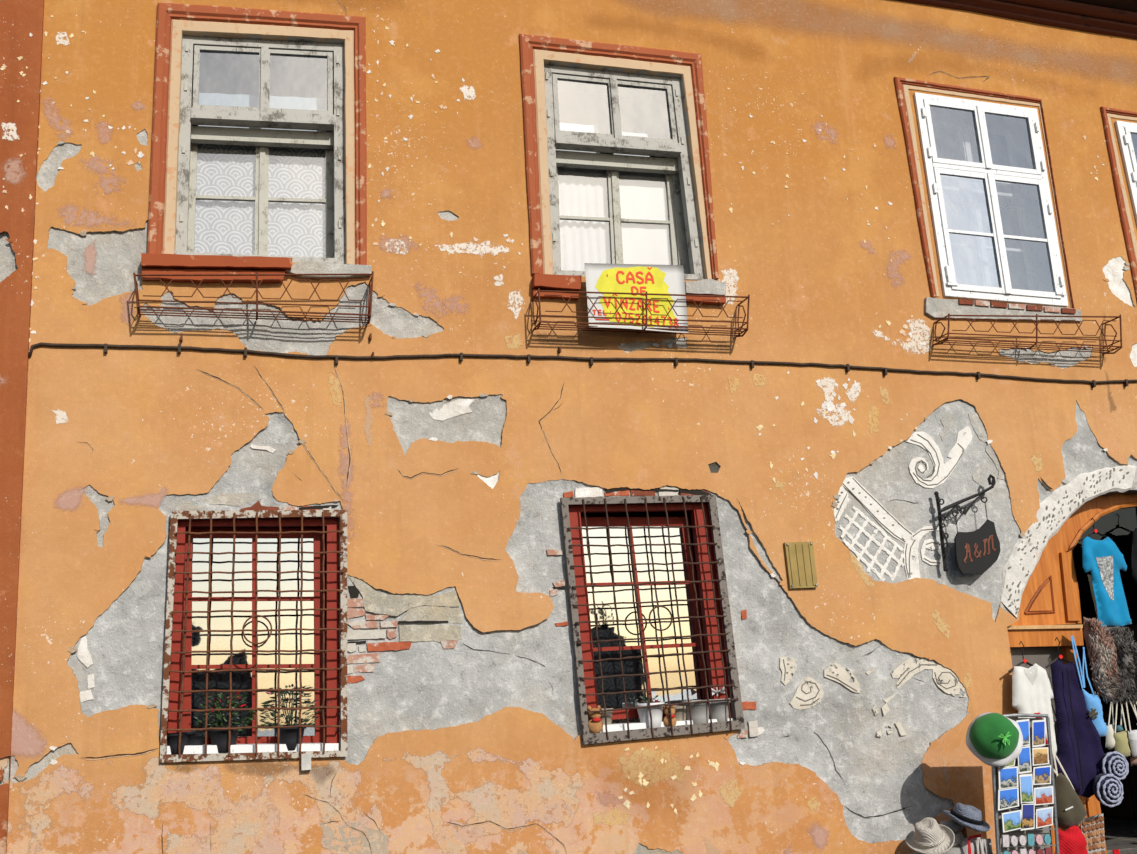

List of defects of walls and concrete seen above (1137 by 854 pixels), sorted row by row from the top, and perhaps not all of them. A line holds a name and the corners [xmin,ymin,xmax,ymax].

spalling [0,227,18,282]
spalling [31,206,524,355]
spalling [1103,256,1136,308]
peeling [873,315,931,354]
crack [197,367,287,414]
crack [299,365,351,500]
spalling [371,393,508,455]
peeling [800,377,892,437]
spalling [1031,400,1137,503]
spalling [831,399,1033,622]
spalling [56,412,970,854]
peeling [0,712,94,854]